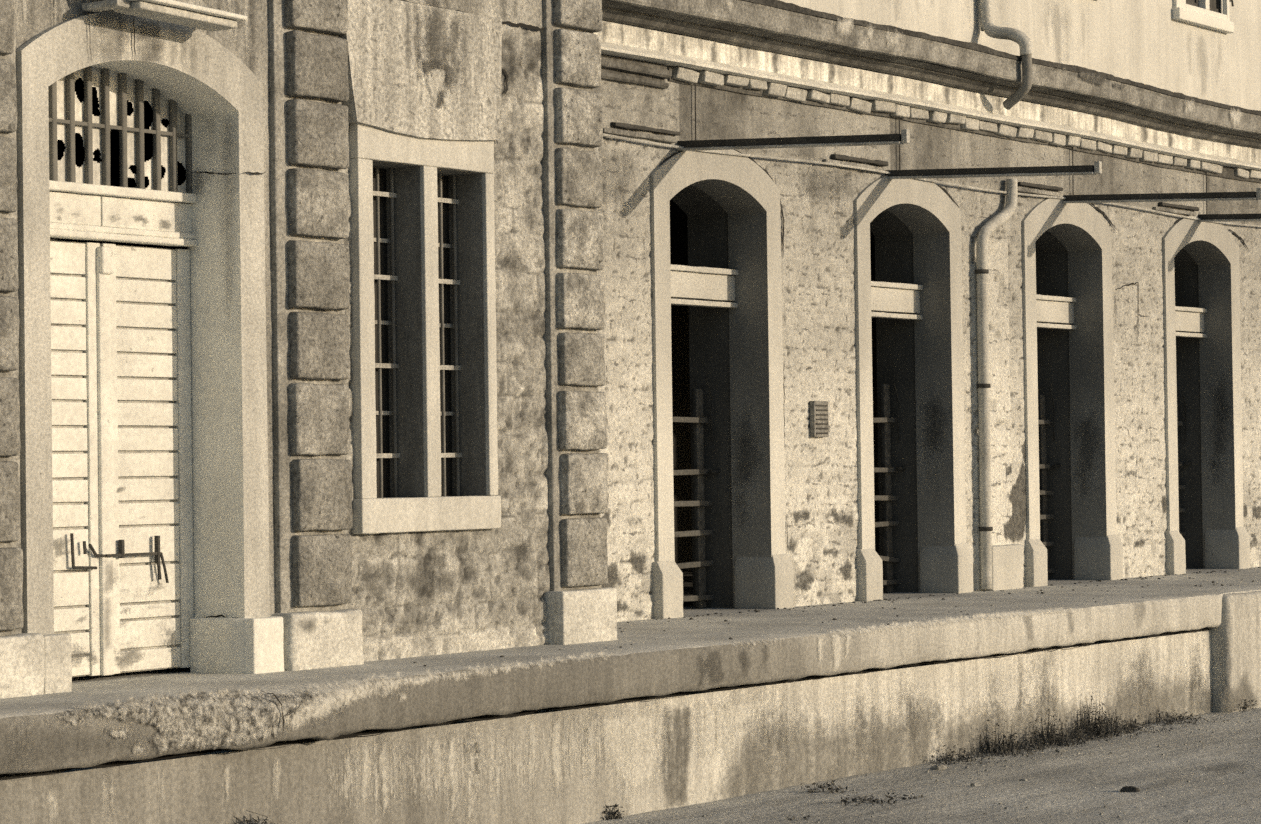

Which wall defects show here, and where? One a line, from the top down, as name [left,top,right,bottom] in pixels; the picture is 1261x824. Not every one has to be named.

leakage [408,0,459,72]
leakage [330,697,931,813]
leakage [946,699,1092,758]
leakage [1108,678,1257,727]